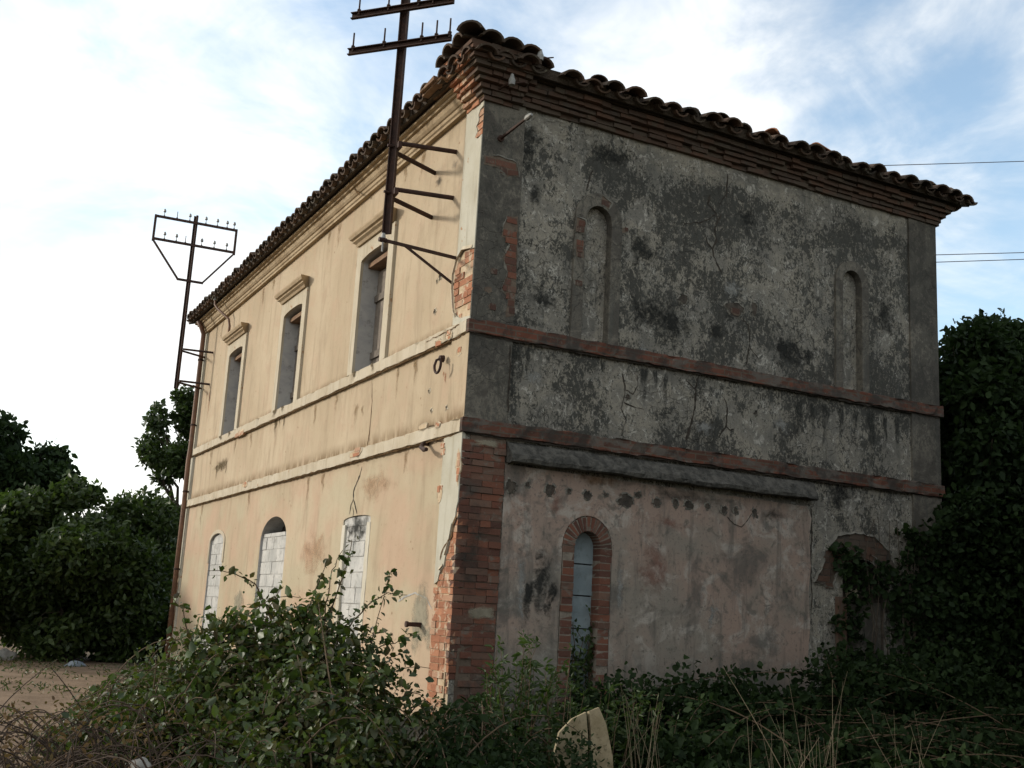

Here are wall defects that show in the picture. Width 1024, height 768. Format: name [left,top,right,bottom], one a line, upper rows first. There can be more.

damp [523,126,541,166]
spalling [436,216,518,318]
damp [632,234,652,266]
damp [635,298,688,334]
damp [874,302,892,332]
damp [777,338,814,365]
crack [621,373,644,432]
spalling [440,443,463,485]
spalling [814,531,900,589]
damp [518,564,533,615]